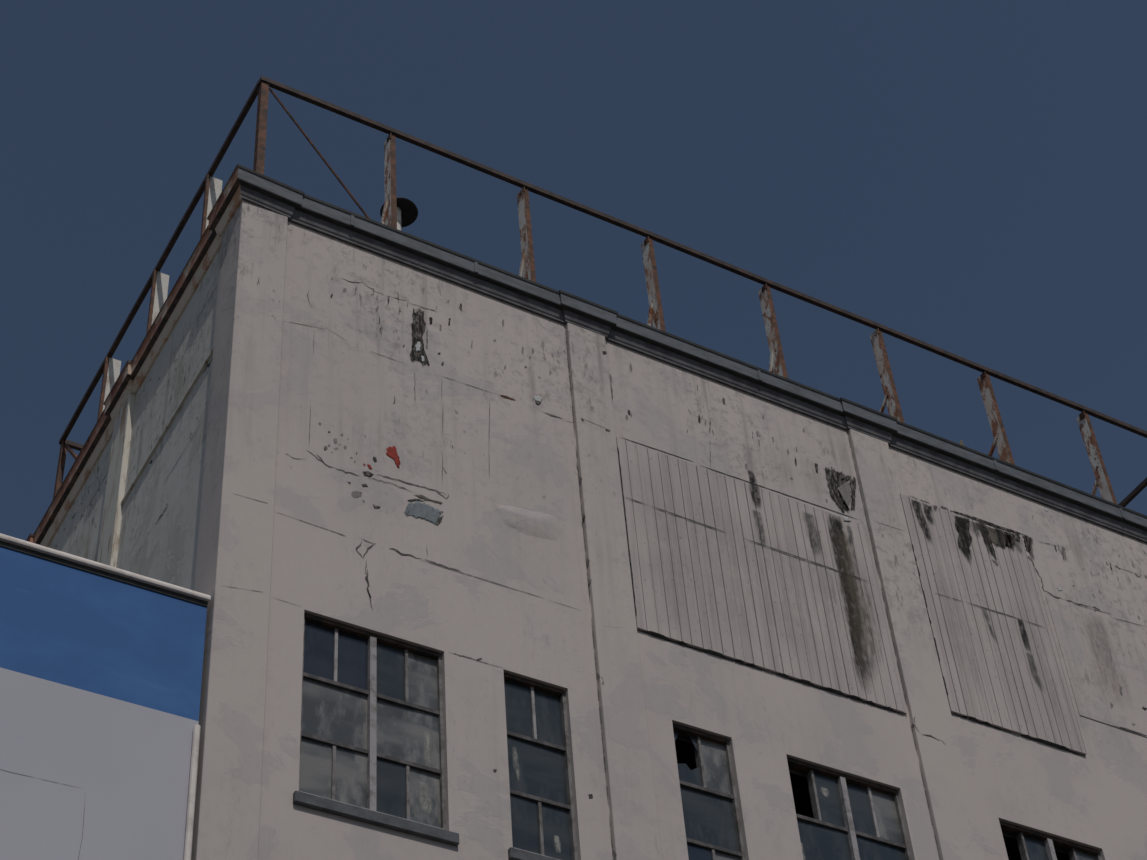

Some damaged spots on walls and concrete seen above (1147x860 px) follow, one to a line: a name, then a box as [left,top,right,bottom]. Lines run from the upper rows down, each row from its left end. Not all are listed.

spalling [403,308,444,366]
peeling [347,446,401,487]
peeling [405,495,443,526]
water stain [748,471,765,541]
spalling [815,463,856,522]
water stain [912,497,1038,573]
crack [336,532,460,609]
water stain [805,513,874,669]